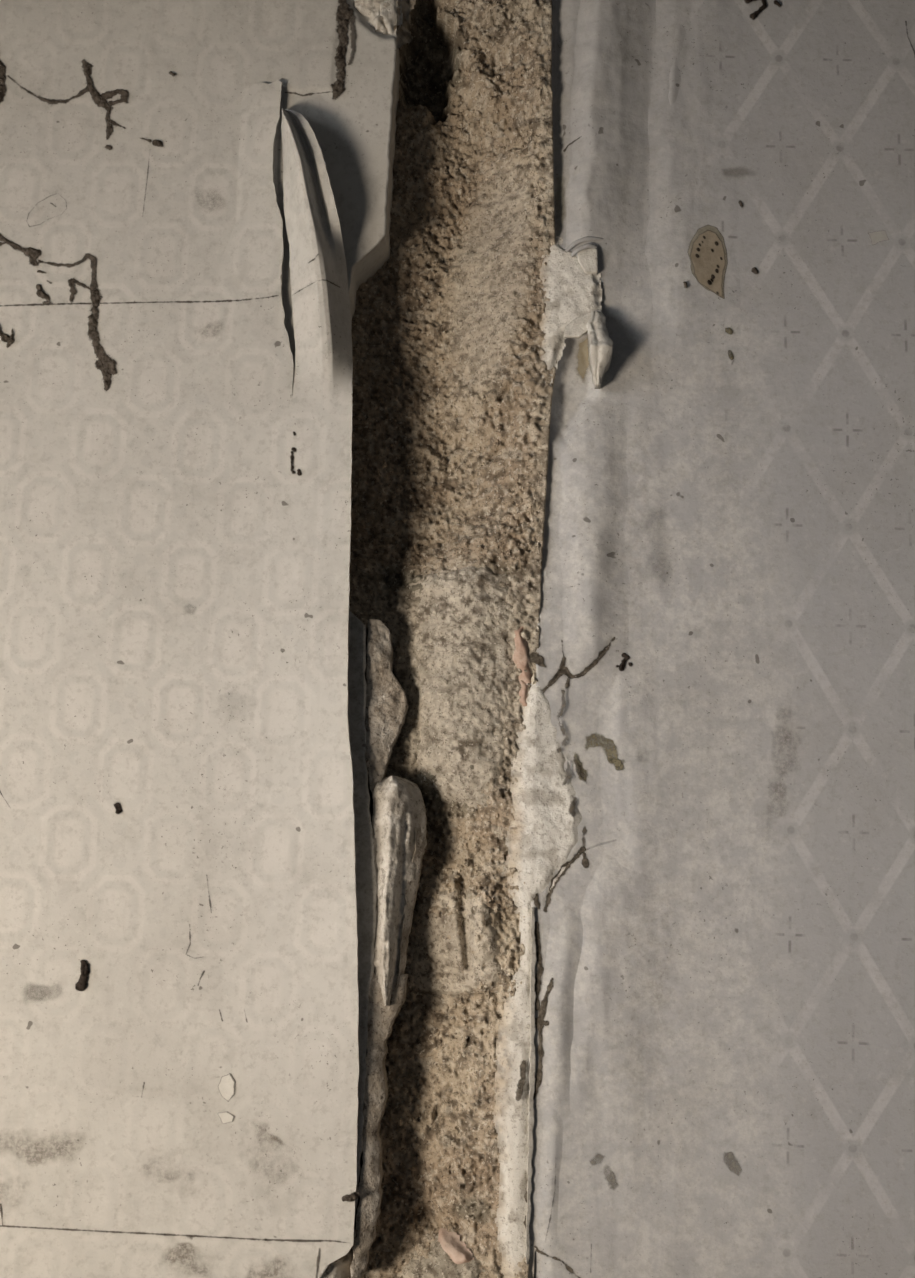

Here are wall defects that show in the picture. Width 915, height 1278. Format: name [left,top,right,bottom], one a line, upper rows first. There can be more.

crack [0,59,129,150]
crack [285,0,356,100]
crack [0,203,339,391]
flaking render [321,0,613,1278]
crack [529,637,615,693]
crack [516,847,589,1101]
crack [523,1166,591,1278]